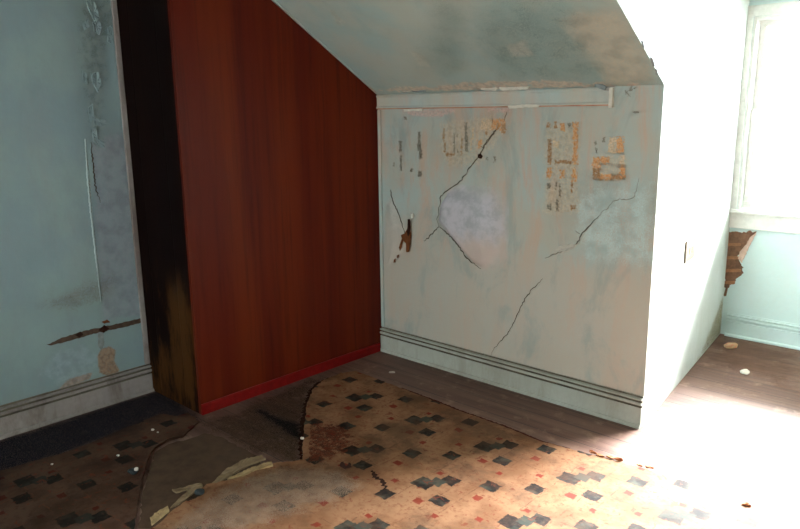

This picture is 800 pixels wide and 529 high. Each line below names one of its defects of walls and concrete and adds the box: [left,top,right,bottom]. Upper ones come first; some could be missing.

crack [425,112,508,269]
crack [546,179,639,259]
flaking render [724,230,757,296]
crack [491,279,544,355]